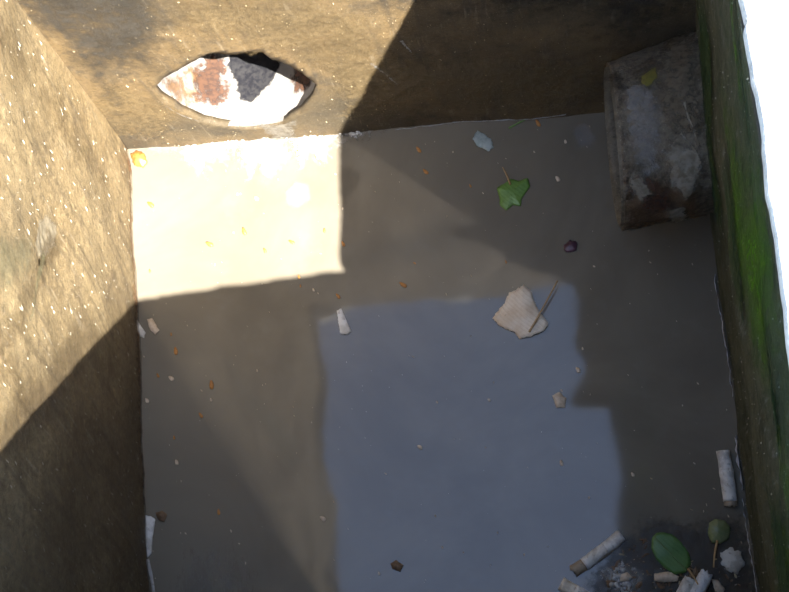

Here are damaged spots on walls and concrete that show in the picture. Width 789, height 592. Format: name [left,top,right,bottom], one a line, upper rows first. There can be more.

corrosion [167,54,230,108]
corrosion [291,69,310,92]
corrosion [623,181,706,230]
damp [735,435,757,592]